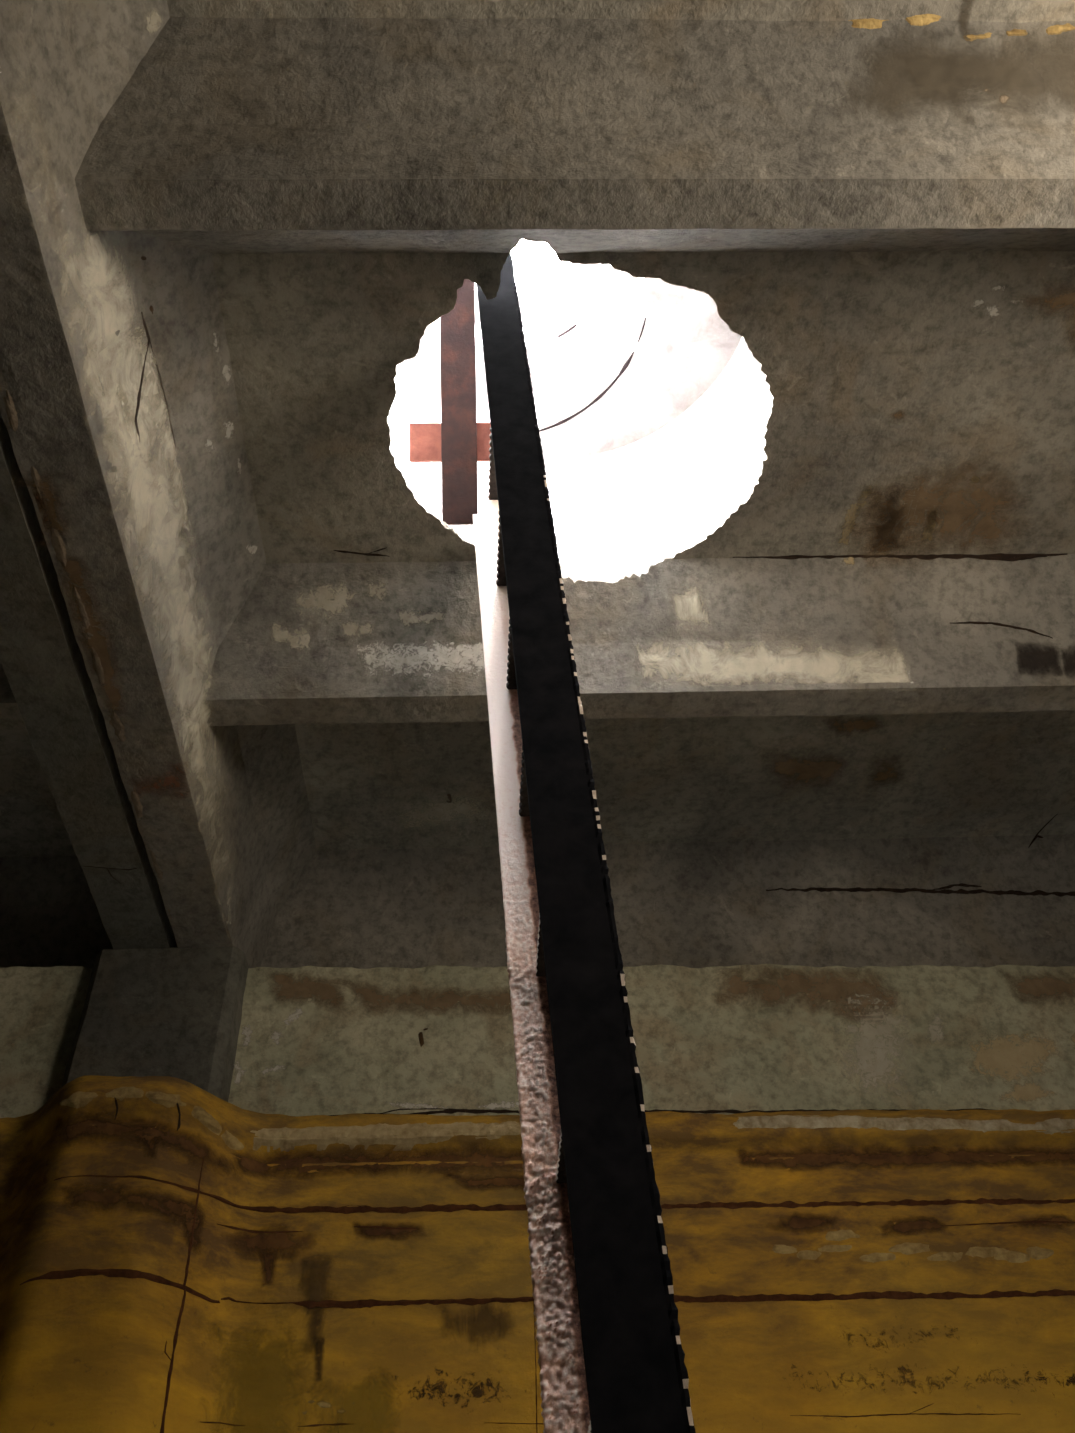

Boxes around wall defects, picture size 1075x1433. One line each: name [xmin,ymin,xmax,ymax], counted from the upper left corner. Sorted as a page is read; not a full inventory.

leakage [1016,644,1075,675]
crack [766,883,1075,897]
crack [174,1103,182,1131]
crack [328,1108,519,1116]
crack [645,1107,906,1115]
crack [946,1105,992,1113]
crack [661,1198,1075,1226]
crack [20,1158,544,1433]
crack [674,1289,1075,1303]
leakage [231,1227,391,1433]